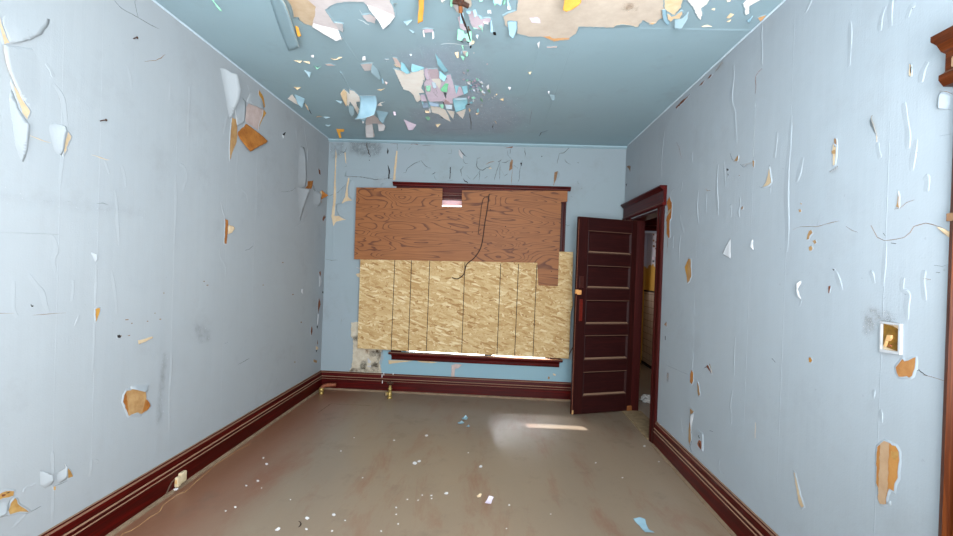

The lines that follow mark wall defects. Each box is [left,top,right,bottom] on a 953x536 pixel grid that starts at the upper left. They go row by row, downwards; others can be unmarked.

peeling [726,0,767,23]
peeling [270,0,715,138]
peeling [14,86,30,118]
peeling [230,91,266,159]
crack [330,111,542,196]
peeling [322,152,351,226]
crack [795,200,949,244]
flaking render [348,321,572,382]
peeling [896,357,916,377]
peeling [126,389,147,416]
peeling [0,491,28,514]
peeling [876,443,899,504]